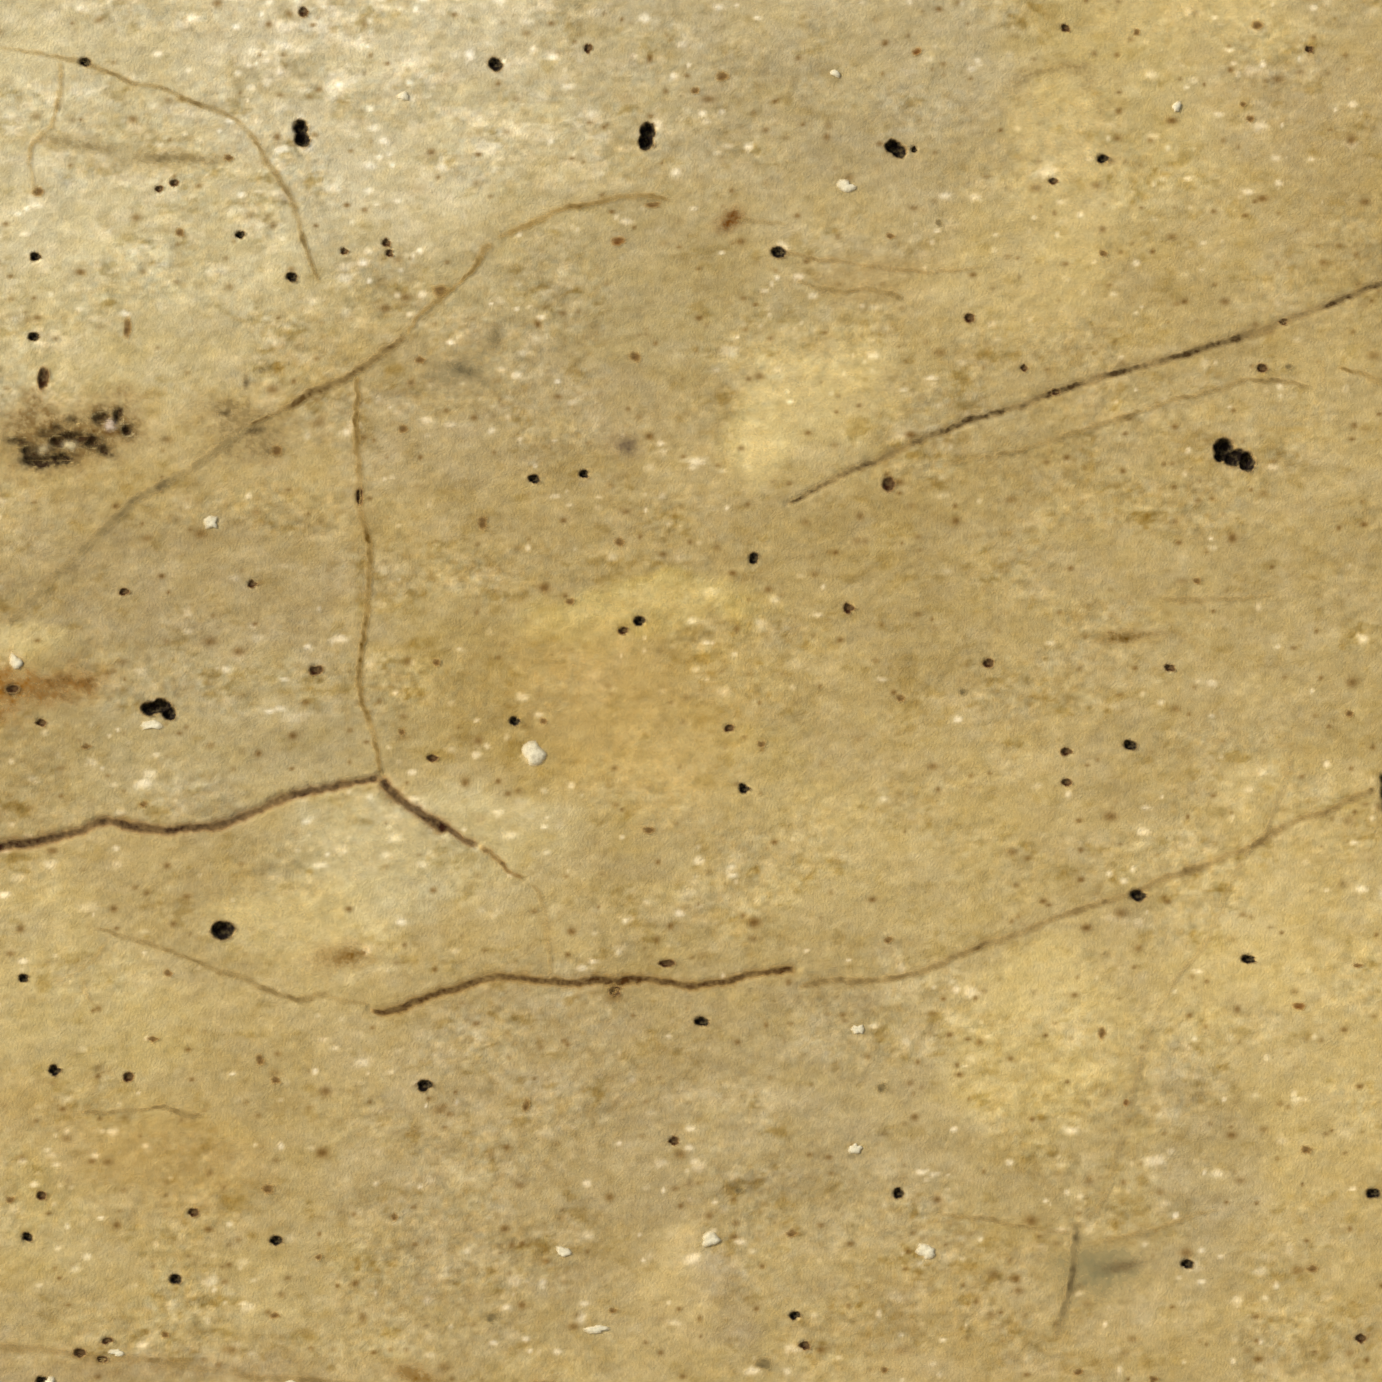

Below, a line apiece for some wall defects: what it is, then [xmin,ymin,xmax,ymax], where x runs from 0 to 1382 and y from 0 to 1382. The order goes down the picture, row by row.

crack [796,253,909,299]
crack [790,281,1382,504]
crack [0,193,666,878]
corrosion [0,667,96,719]
crack [101,929,311,1003]
crack [372,788,1374,1016]